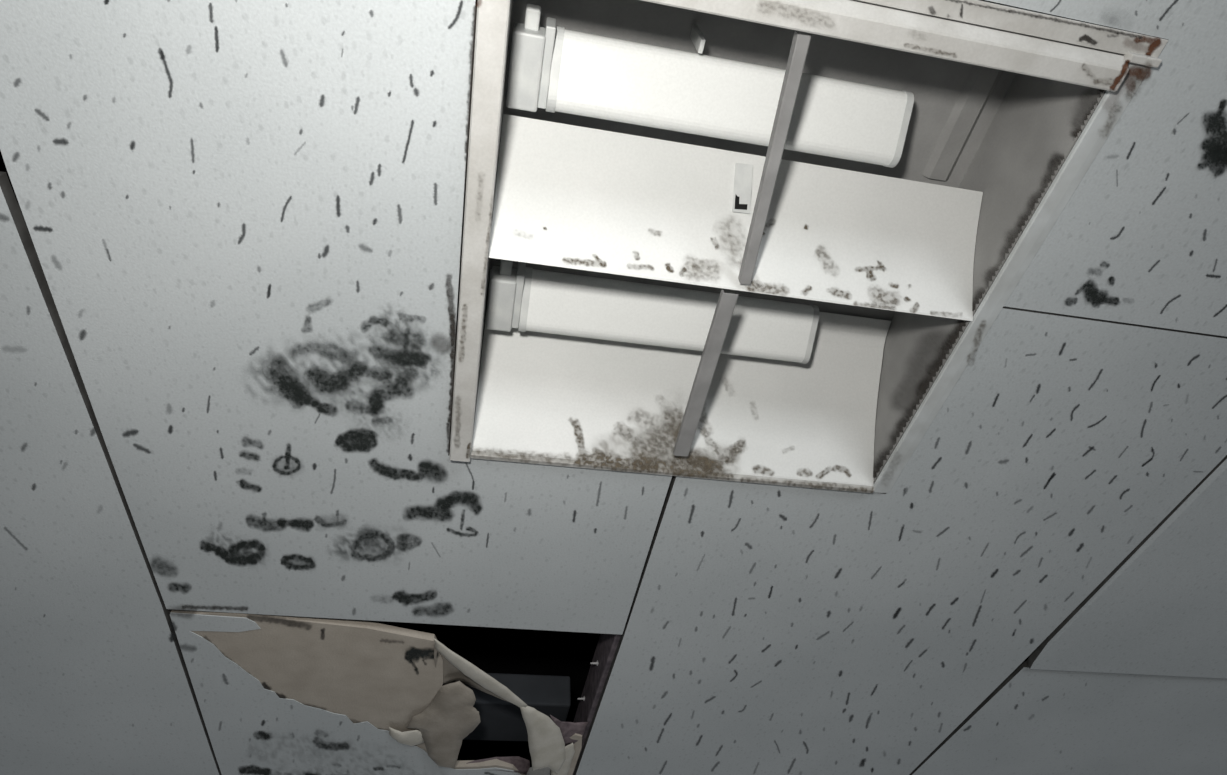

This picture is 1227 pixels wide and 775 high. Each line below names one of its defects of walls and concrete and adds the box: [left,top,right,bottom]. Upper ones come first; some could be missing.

rust [1110,36,1161,90]
damp [1198,100,1227,176]
damp [1066,262,1119,306]
damp [270,318,446,481]
damp [240,480,261,492]
damp [406,492,482,537]
damp [200,517,346,565]
damp [281,554,315,570]
damp [340,531,421,561]
damp [152,561,324,639]
damp [393,592,451,615]
damp [239,766,271,775]